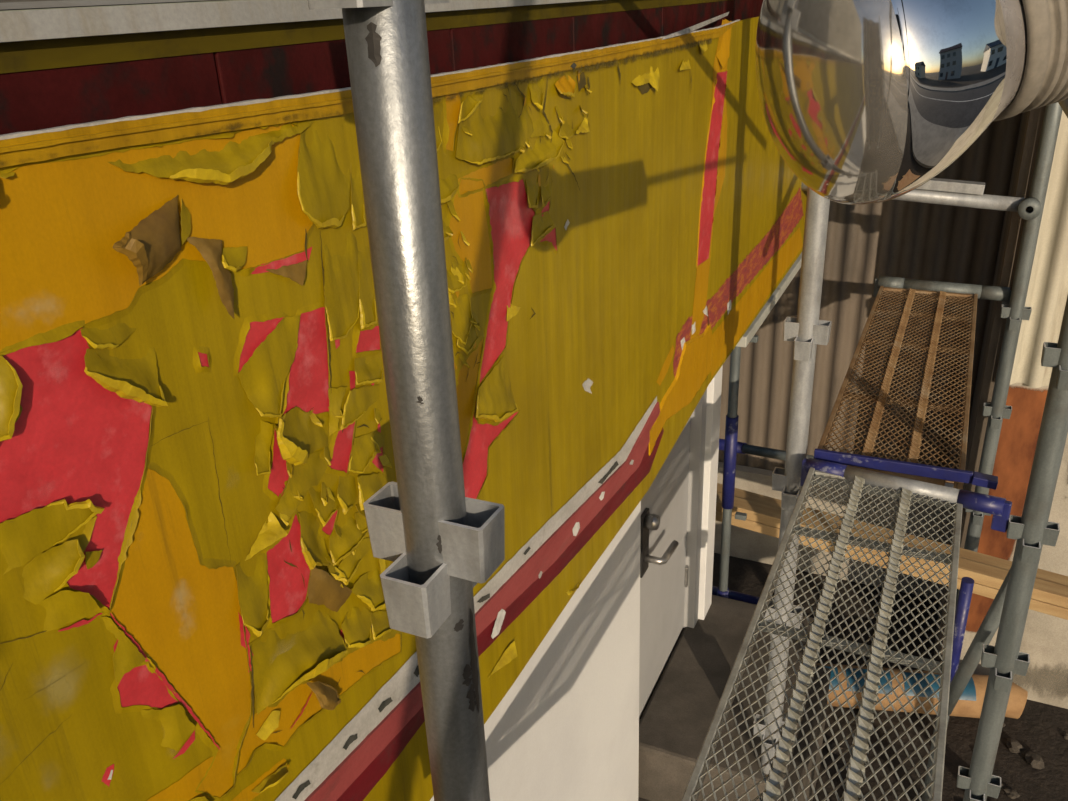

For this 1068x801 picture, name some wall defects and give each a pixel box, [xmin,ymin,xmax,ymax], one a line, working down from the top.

crack [0,623,68,690]
peeling [0,119,402,801]
peeling [433,69,592,499]
peeling [631,66,660,95]
peeling [649,19,803,456]